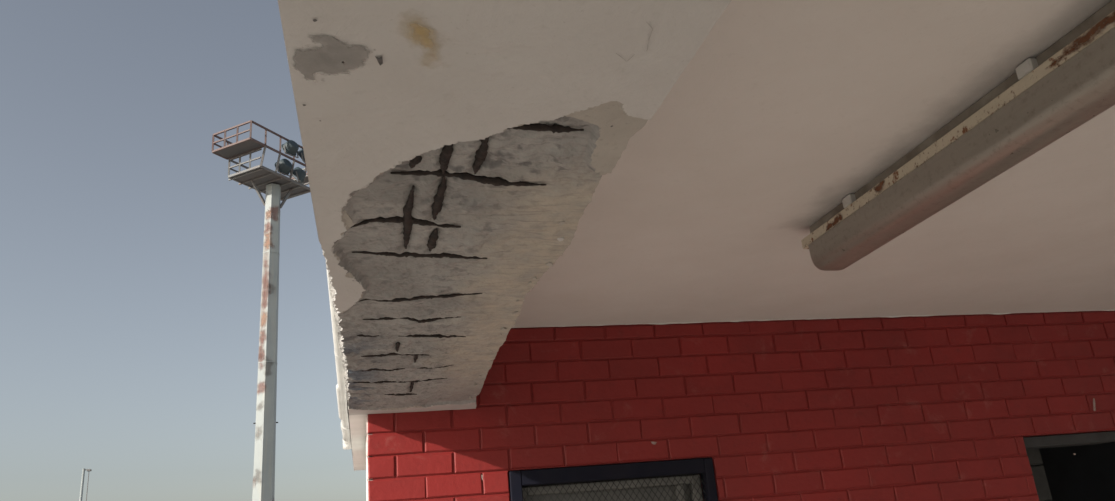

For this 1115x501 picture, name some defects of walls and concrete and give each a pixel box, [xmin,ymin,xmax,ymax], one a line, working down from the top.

peeling [293,36,383,80]
spalling [321,101,648,412]